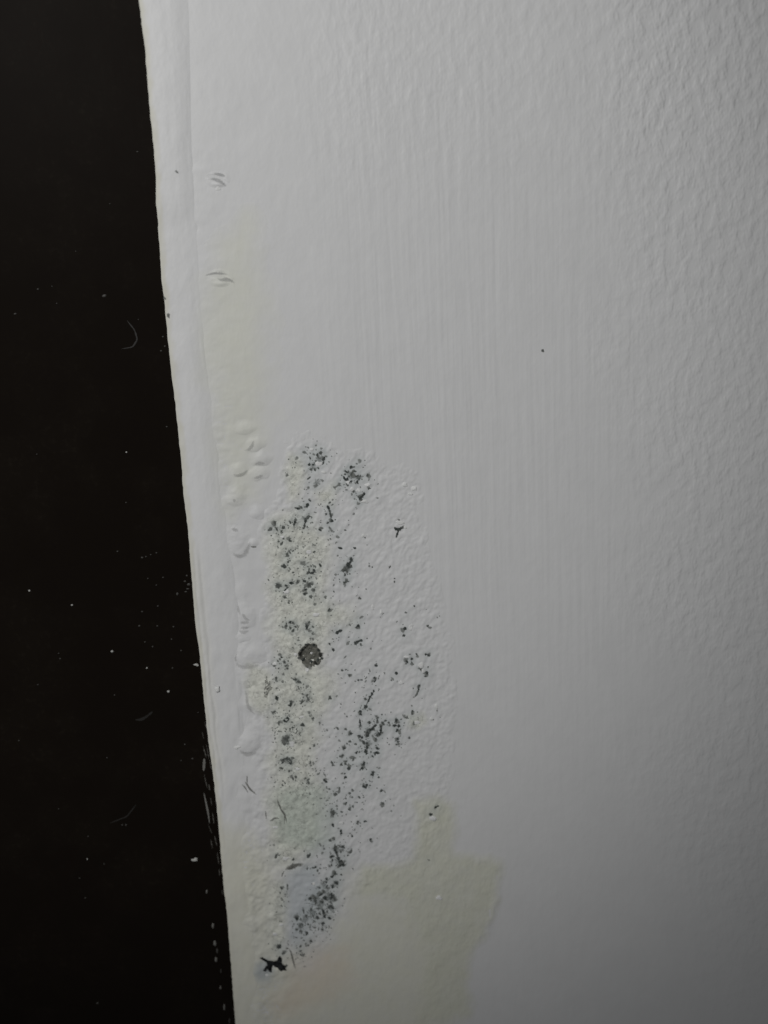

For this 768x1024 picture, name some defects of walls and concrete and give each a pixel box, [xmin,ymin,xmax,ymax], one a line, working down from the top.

leakage [239,437,507,1024]